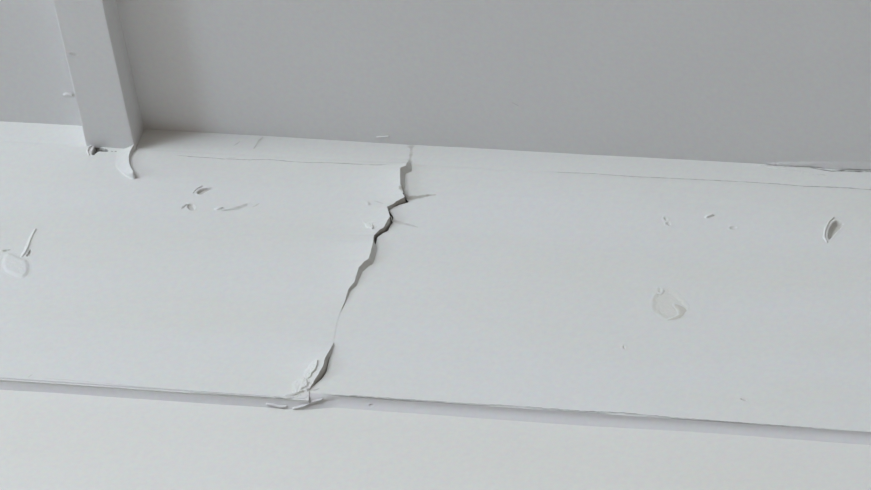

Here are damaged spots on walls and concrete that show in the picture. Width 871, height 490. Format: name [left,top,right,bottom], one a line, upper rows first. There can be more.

peeling [87,145,117,156]
crack [174,145,437,308]
spalling [823,217,846,243]